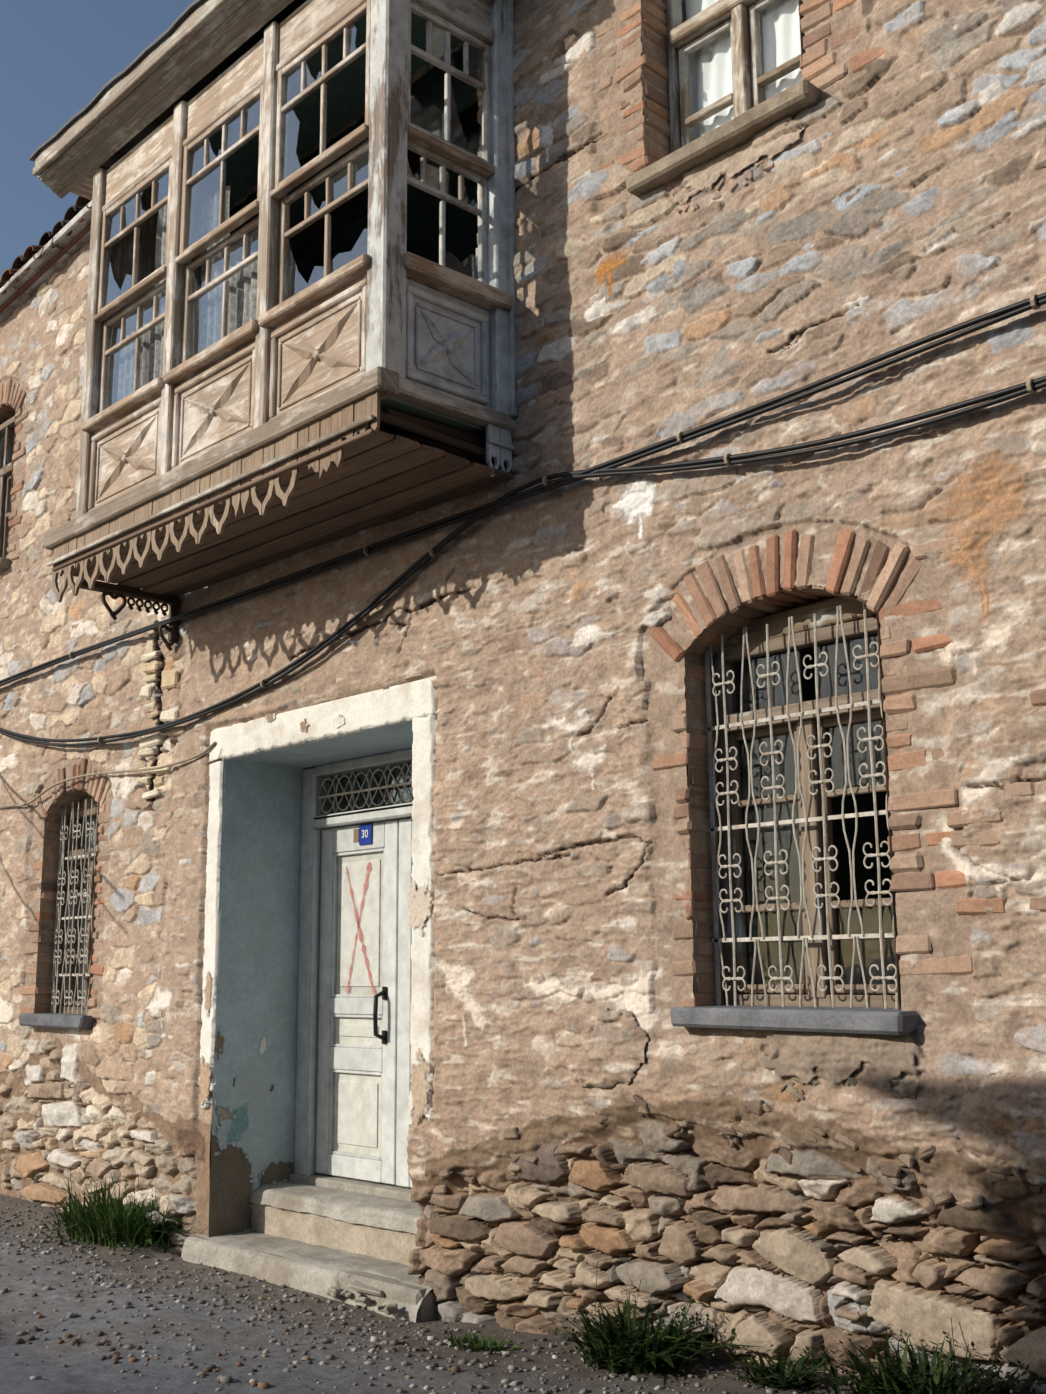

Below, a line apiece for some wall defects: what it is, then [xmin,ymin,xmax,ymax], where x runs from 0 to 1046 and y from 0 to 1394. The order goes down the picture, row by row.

crack [292,575,471,659]
crack [441,835,651,920]
spalling [197,1030,295,1237]